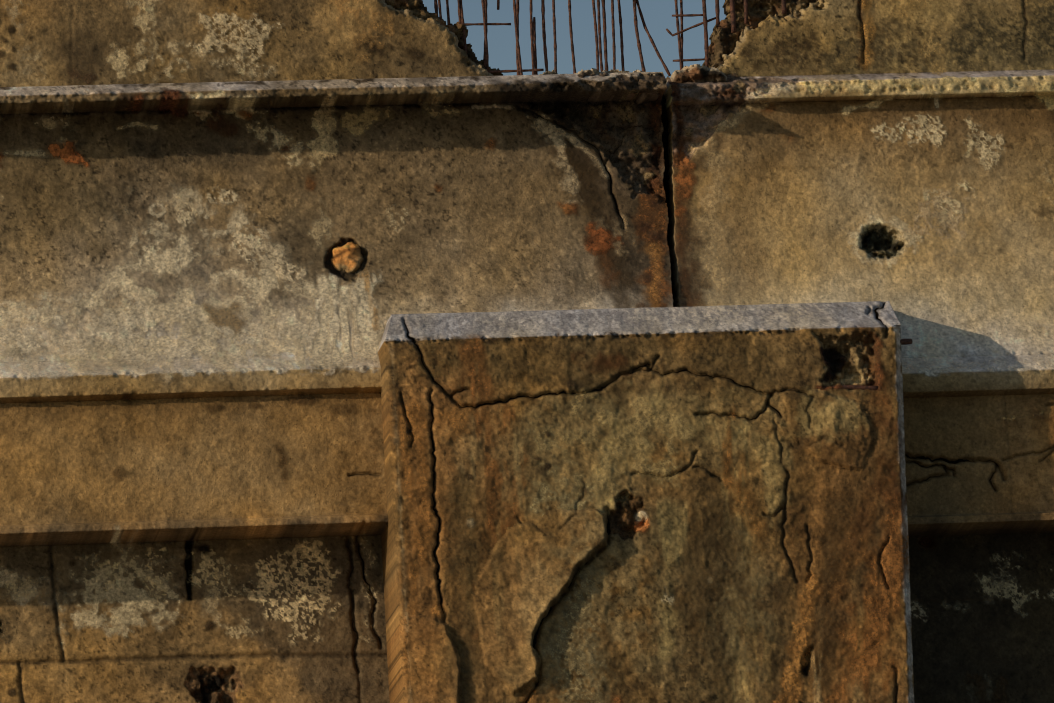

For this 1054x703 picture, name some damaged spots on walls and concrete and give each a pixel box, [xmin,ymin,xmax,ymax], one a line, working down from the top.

damp [108,0,281,78]
spalling [395,0,503,76]
crack [513,105,658,222]
rust [636,82,696,308]
spalling [860,225,905,259]
crack [401,320,813,620]
damp [71,544,178,636]
damp [187,541,341,643]
crack [347,530,381,669]
crack [533,562,588,649]
damp [980,554,1054,610]
spalling [185,665,243,703]